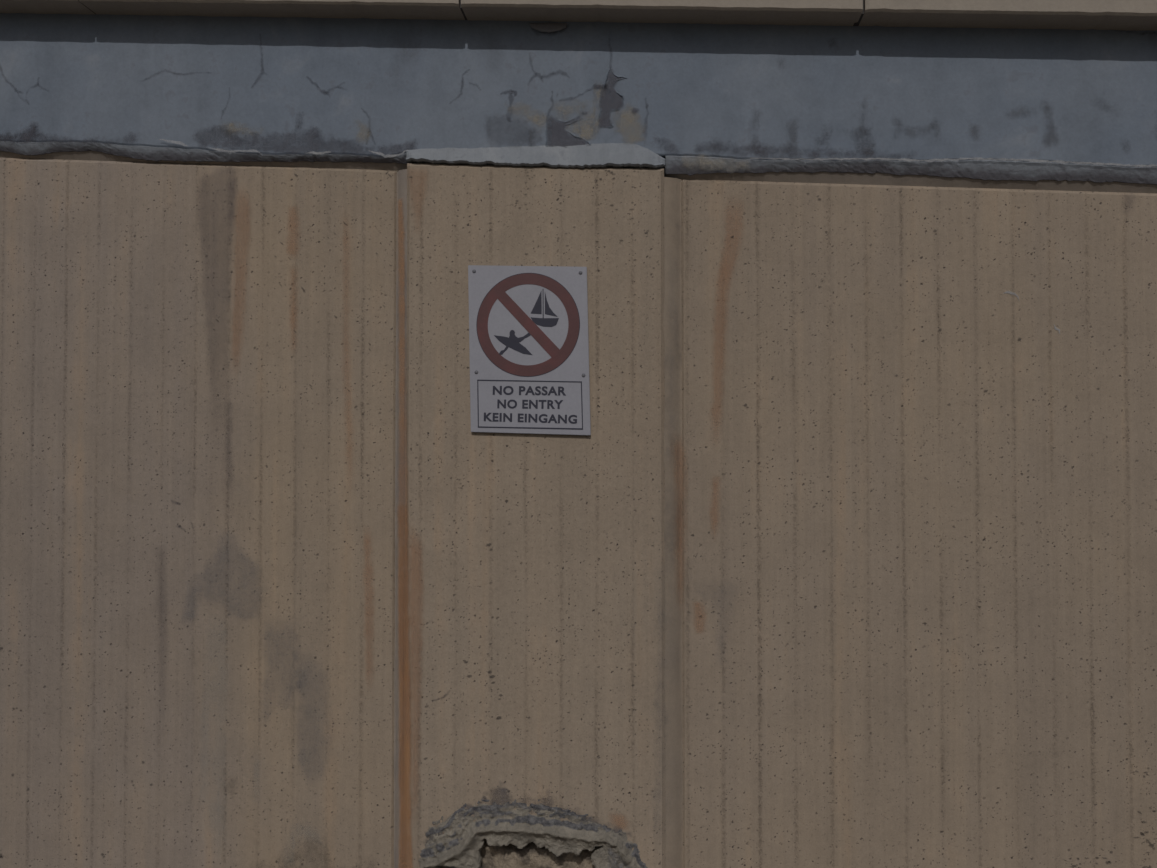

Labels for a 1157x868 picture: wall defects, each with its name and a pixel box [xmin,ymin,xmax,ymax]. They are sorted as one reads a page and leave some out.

peeling [545,68,639,148]
spalling [418,799,648,868]